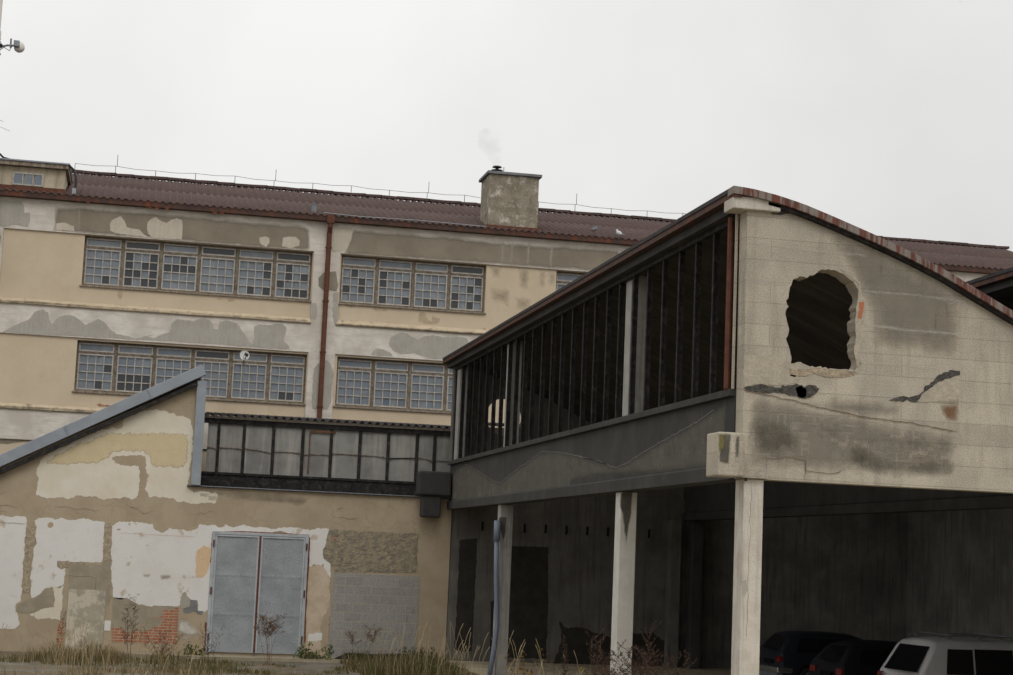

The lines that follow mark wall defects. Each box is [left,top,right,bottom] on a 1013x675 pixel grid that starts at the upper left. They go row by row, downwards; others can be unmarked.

peeling [0,200,30,240]
peeling [55,223,74,231]
peeling [110,216,183,240]
peeling [282,236,300,249]
peeling [3,309,289,349]
peeling [372,312,469,359]
spalling [743,269,866,399]
crack [739,388,957,432]
peeling [36,409,219,504]
crack [767,457,840,480]
leakage [756,407,946,469]
peeling [0,515,419,655]